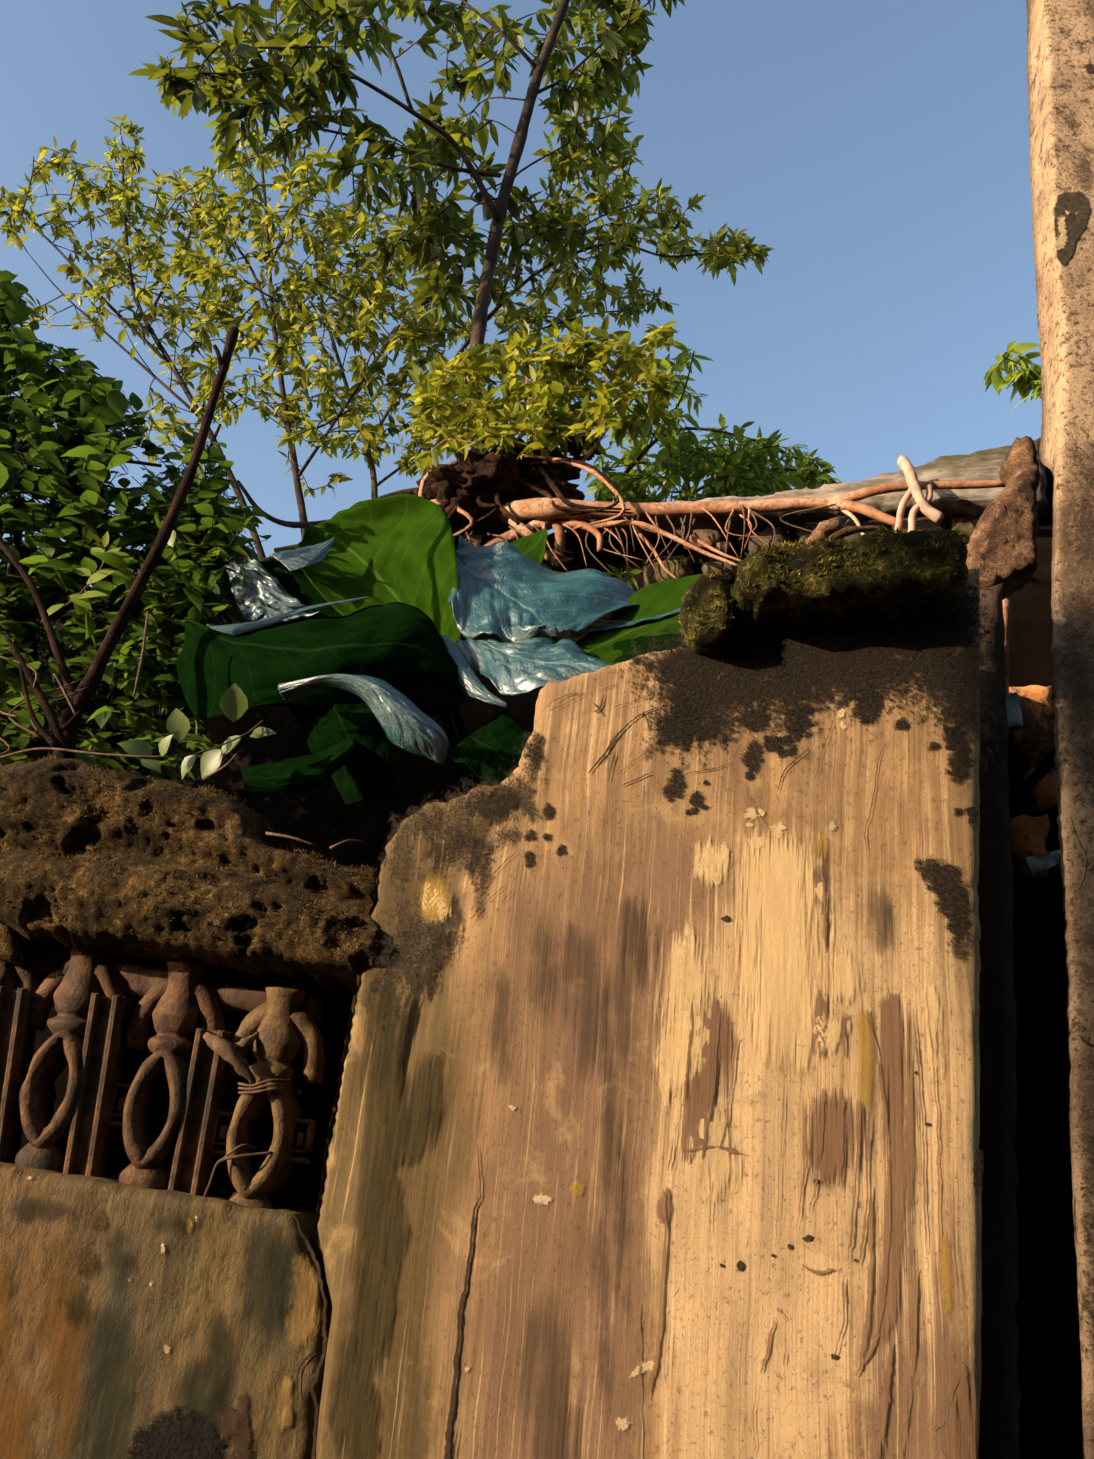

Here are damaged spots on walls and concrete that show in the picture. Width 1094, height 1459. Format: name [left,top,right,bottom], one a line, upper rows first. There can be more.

leakage [620,576,1004,815]
leakage [1055,441,1094,806]
leakage [914,856,973,963]
leakage [953,806,979,828]
leakage [1079,1114,1094,1364]